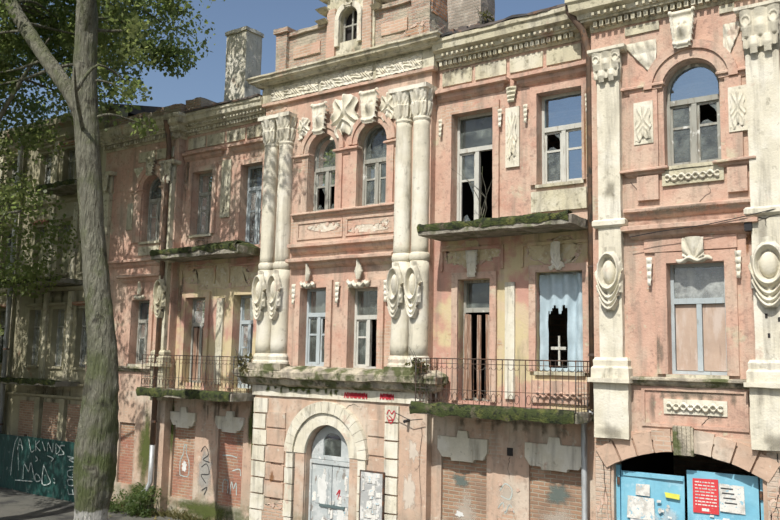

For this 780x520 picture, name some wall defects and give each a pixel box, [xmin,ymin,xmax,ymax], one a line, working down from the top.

leakage [266,386,338,396]
flaking render [769,480,780,520]